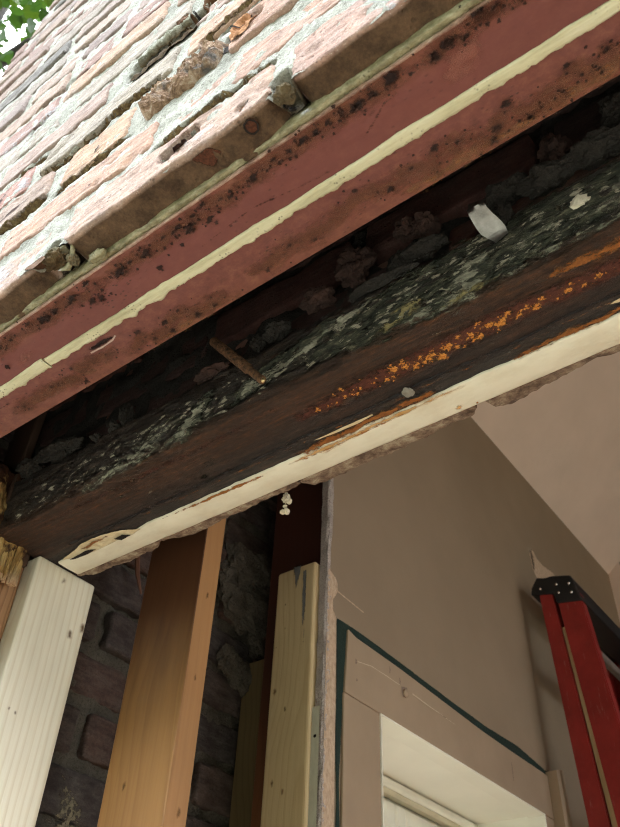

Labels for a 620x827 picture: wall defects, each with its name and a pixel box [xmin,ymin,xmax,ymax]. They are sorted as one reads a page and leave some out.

spalling [138,13,257,121]
corrosion [0,0,527,354]
corrosion [250,39,620,275]
spalling [25,245,80,272]
peeling [90,335,116,354]
leakage [15,155,620,519]
corrosion [294,237,620,421]
flaking render [486,344,620,407]
peeling [63,529,140,560]
spalling [77,405,477,827]
flaking render [529,550,554,578]